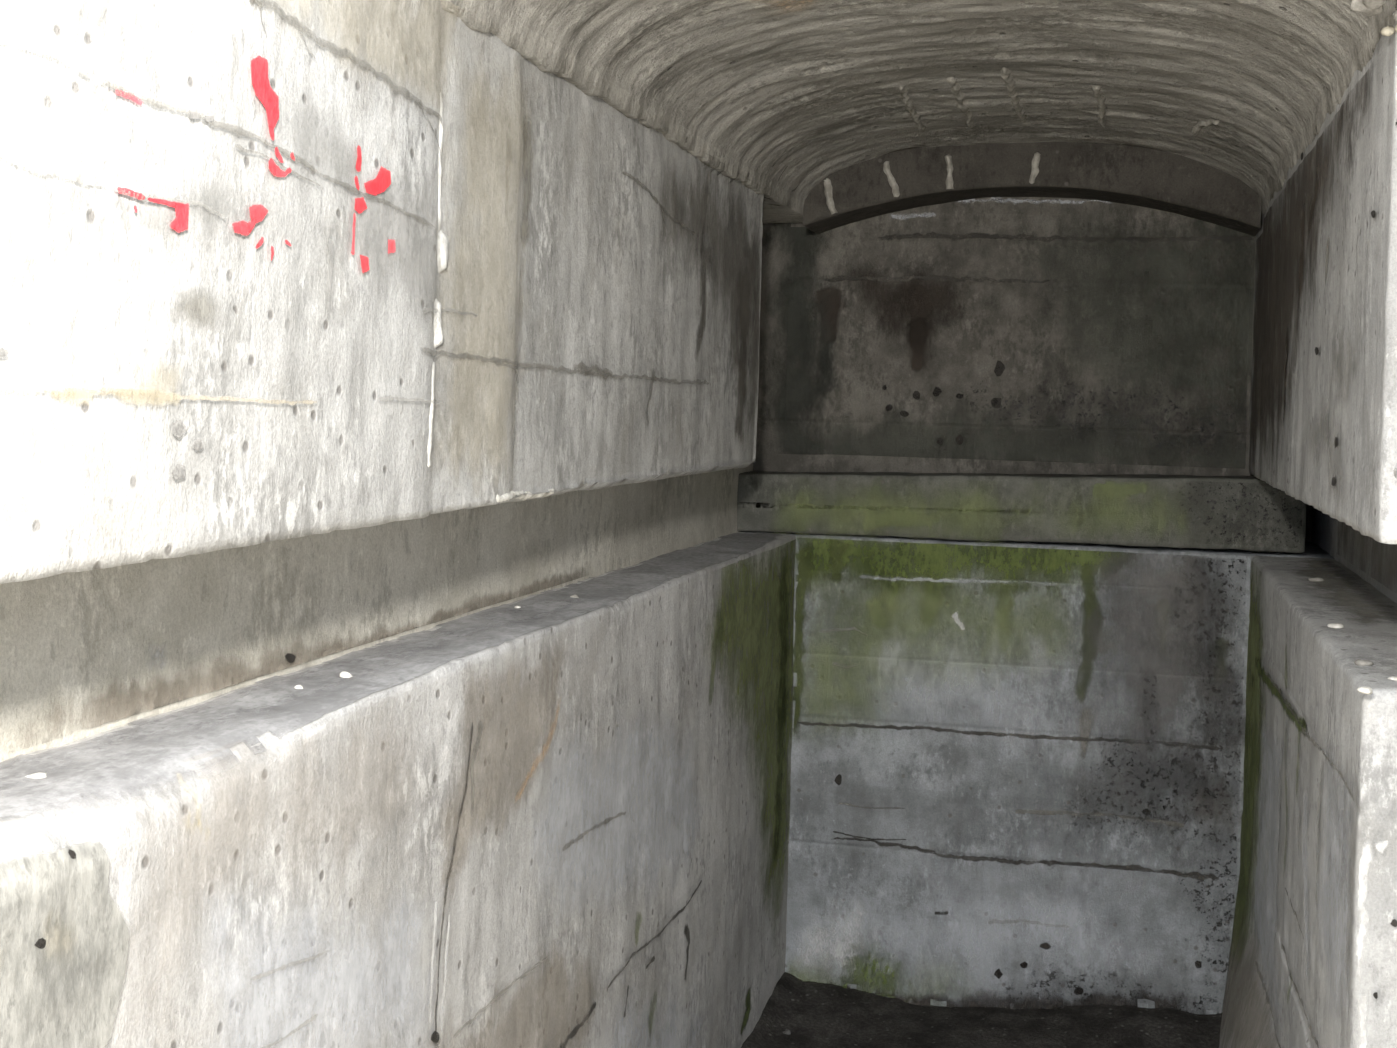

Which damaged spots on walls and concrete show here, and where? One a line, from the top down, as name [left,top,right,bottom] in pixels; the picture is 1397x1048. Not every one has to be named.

spalling [1351,0,1397,36]
crack [0,386,314,405]
crack [423,348,709,423]
leakage [672,102,1352,984]
crack [798,722,1219,750]
crack [833,803,1218,880]
spalling [0,841,129,1048]